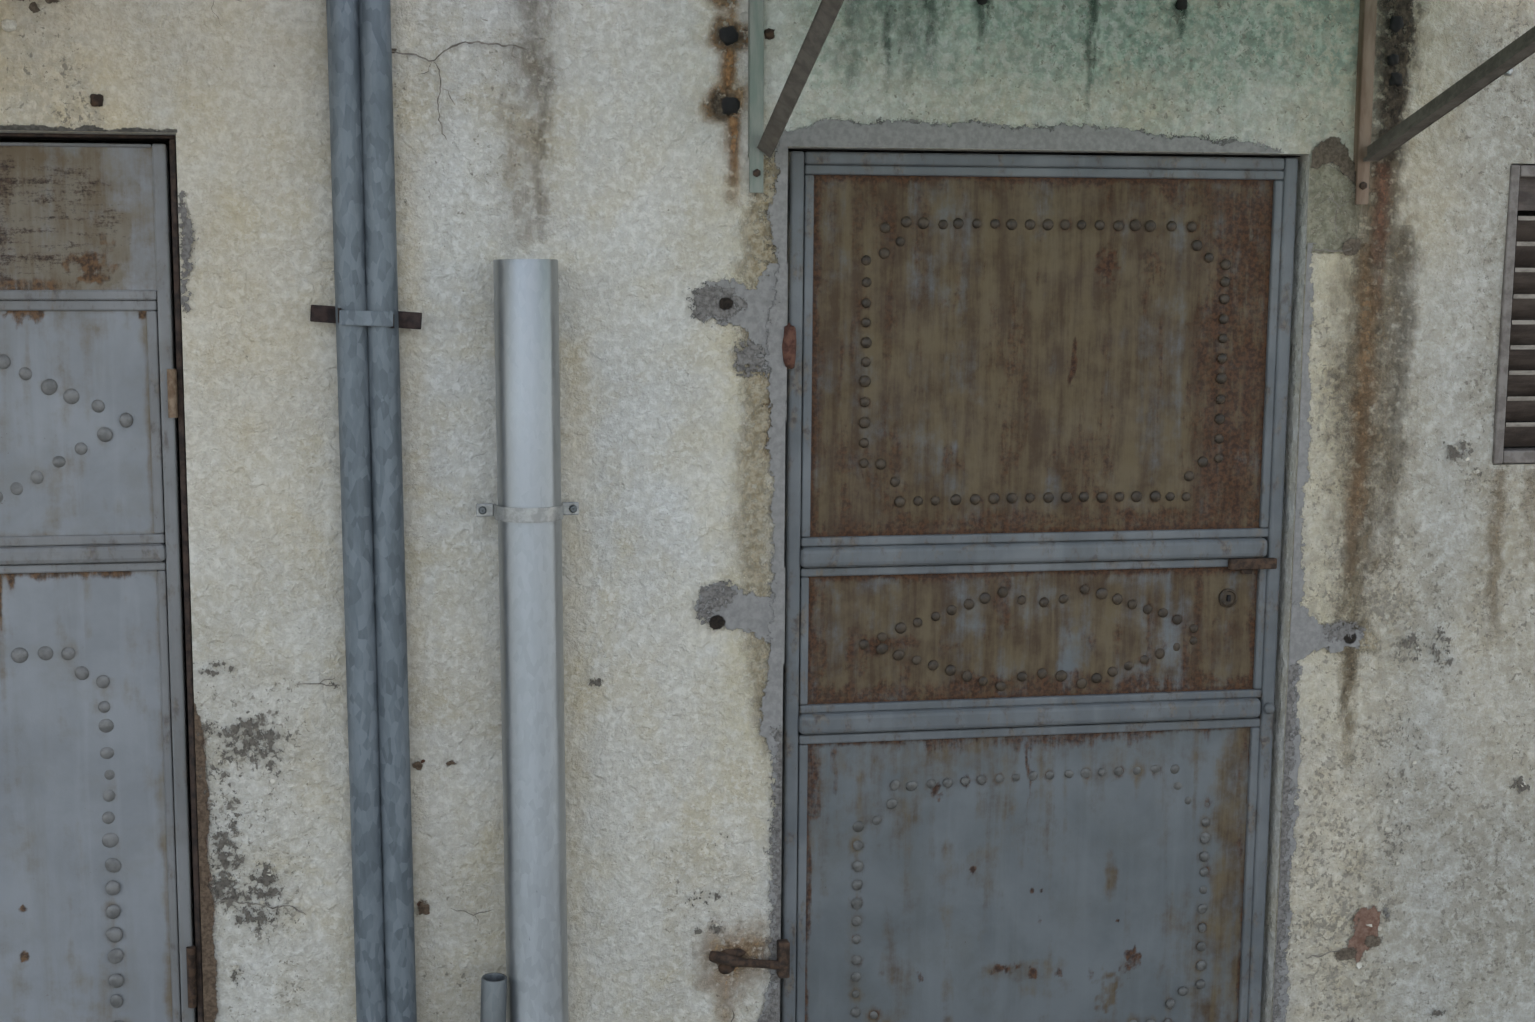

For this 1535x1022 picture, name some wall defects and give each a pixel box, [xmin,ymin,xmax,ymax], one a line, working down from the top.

crack [392,41,528,138]
rust [702,0,748,170]
rust [1335,160,1412,741]
flaking render [685,116,1284,1022]
peeling [193,660,234,677]
peeling [196,711,306,935]
flaking render [1306,906,1391,969]